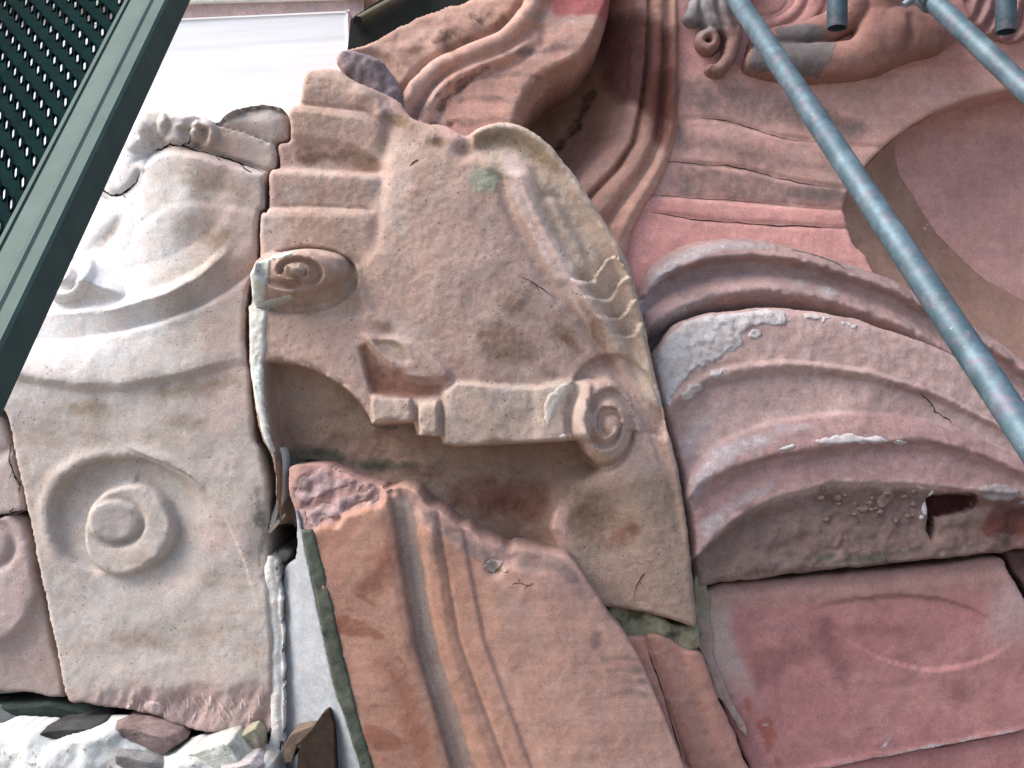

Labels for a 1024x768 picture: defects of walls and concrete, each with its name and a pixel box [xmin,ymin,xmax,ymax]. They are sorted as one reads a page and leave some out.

crack [703,118,810,142]
crack [154,133,263,173]
crack [103,175,139,198]
crack [652,161,846,269]
peeling [803,313,857,329]
peeling [655,308,790,407]
peeling [815,433,907,445]
spalling [816,486,978,535]
spalling [277,460,690,768]